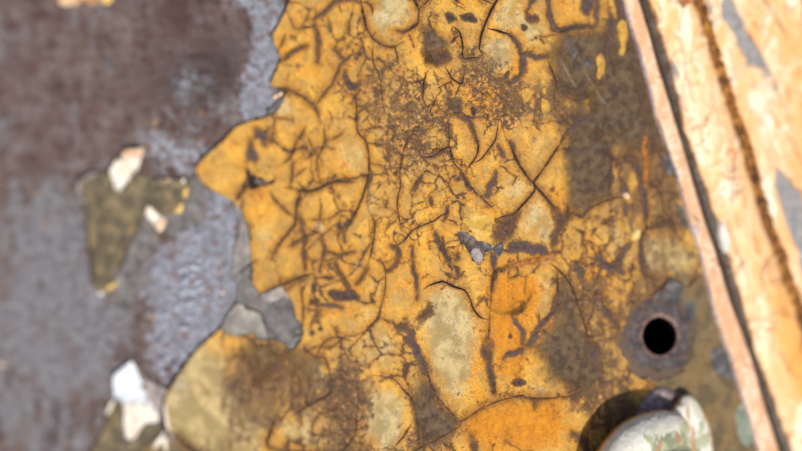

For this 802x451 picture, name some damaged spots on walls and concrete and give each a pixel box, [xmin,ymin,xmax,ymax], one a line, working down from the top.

peeling [0,0,289,451]
crack [171,431,198,451]
corrosion [245,129,268,163]
corrosion [386,244,418,300]
crack [234,0,701,451]
corrosion [333,0,673,291]
corrosion [480,273,636,451]
corrosion [595,295,695,381]